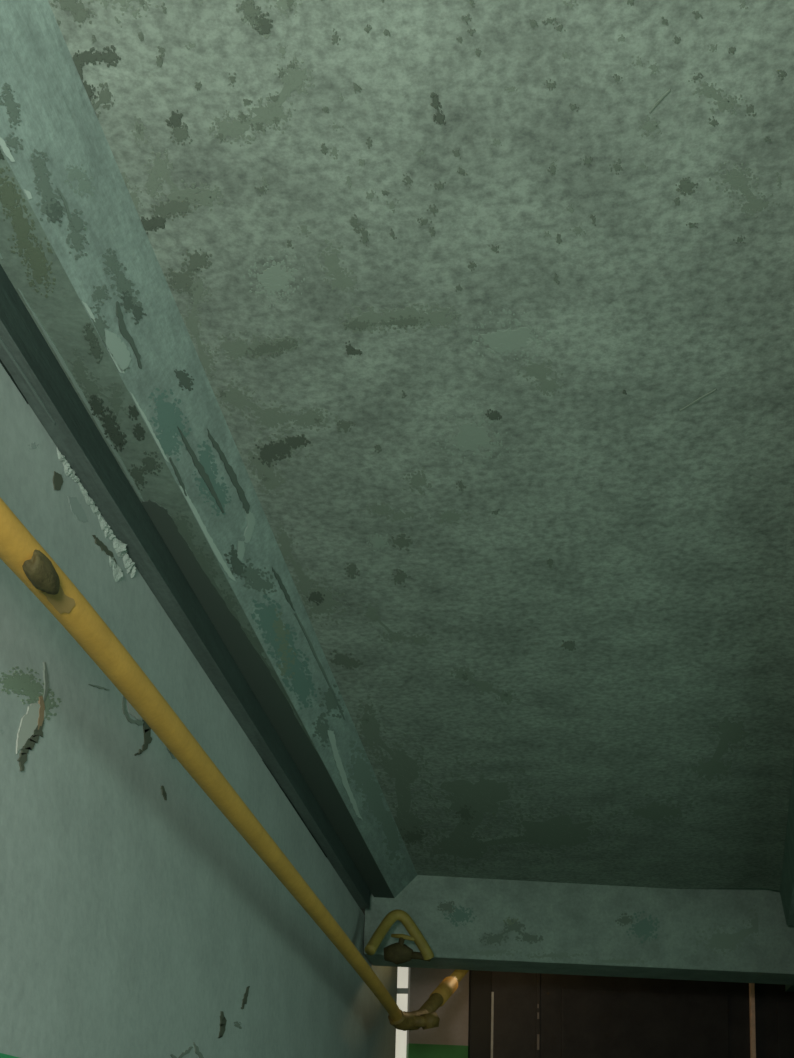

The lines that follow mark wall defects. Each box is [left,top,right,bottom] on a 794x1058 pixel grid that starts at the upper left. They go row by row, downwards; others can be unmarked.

peeling [0,137,15,162]
peeling [18,289,144,501]
peeling [129,391,169,462]
crack [169,426,250,514]
peeling [53,448,137,582]
peeling [178,485,256,581]
peeling [16,703,46,754]
crack [17,662,49,771]
crack [88,684,176,759]
crack [160,786,168,800]
peeling [327,730,363,821]
crack [170,986,250,1058]